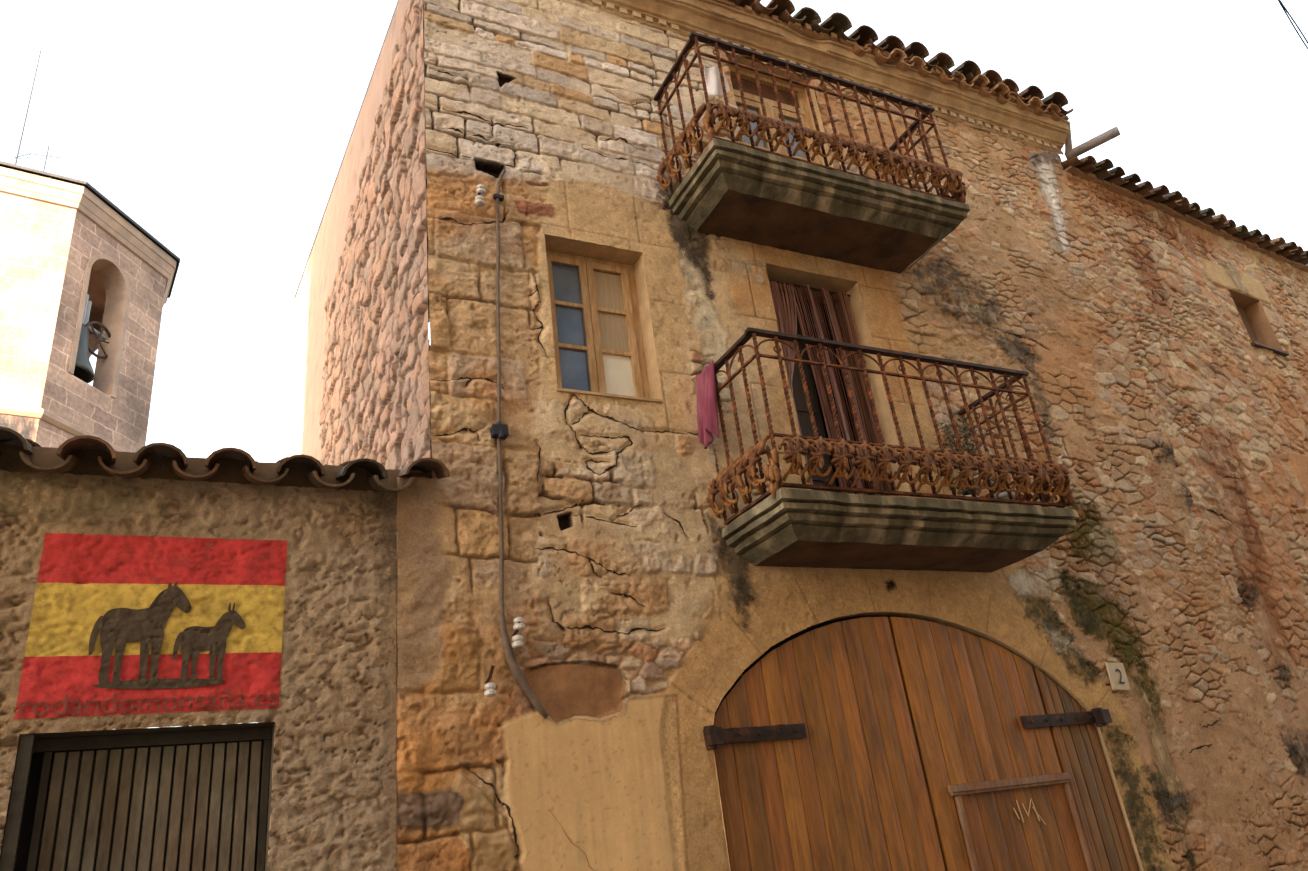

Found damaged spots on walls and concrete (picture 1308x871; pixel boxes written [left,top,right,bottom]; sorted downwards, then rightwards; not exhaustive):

water stain [1032,152,1062,166]
crack [528,275,547,356]
water stain [656,187,737,412]
water stain [0,414,36,441]
water stain [709,518,755,631]
water stain [1007,560,1102,687]
water stain [1088,525,1119,564]
water stain [1130,646,1196,870]
crack [466,767,520,871]